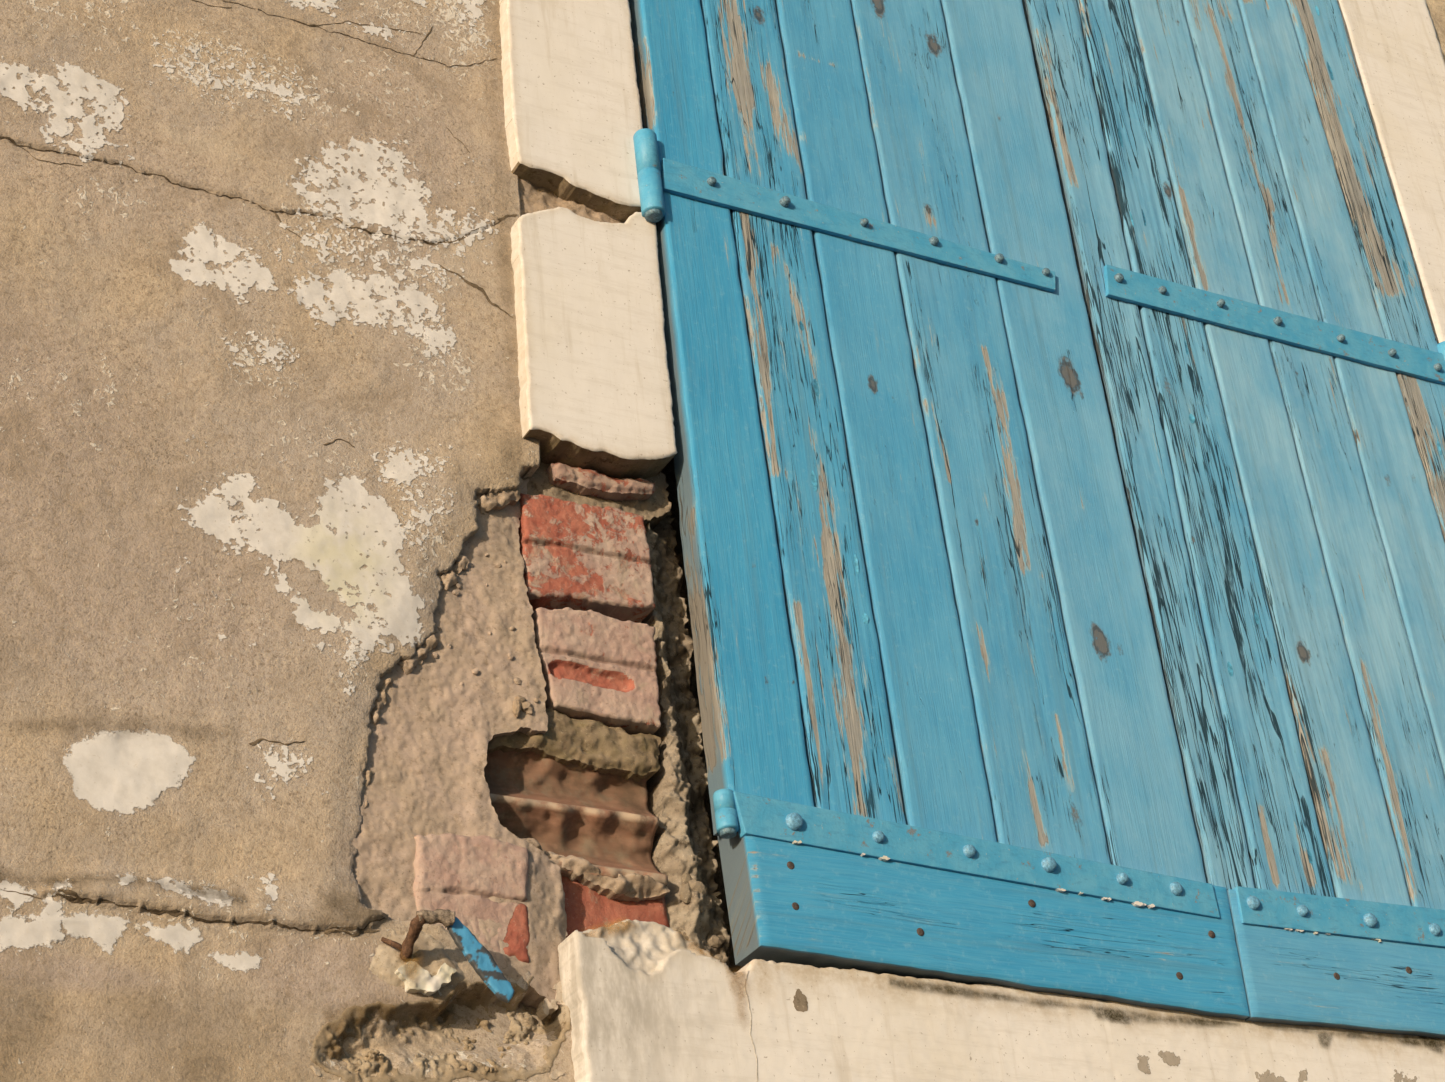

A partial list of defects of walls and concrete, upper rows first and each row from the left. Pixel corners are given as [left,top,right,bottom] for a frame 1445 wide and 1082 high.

crack [194,0,497,67]
peeling [0,56,140,168]
crack [0,136,517,318]
peeling [158,131,504,367]
peeling [63,729,196,816]
flaking render [176,441,571,1082]
peeling [0,872,262,973]
crack [1,887,385,937]
peeling [1137,1051,1180,1074]
peeling [1255,1069,1308,1082]
peeling [1394,1069,1417,1082]